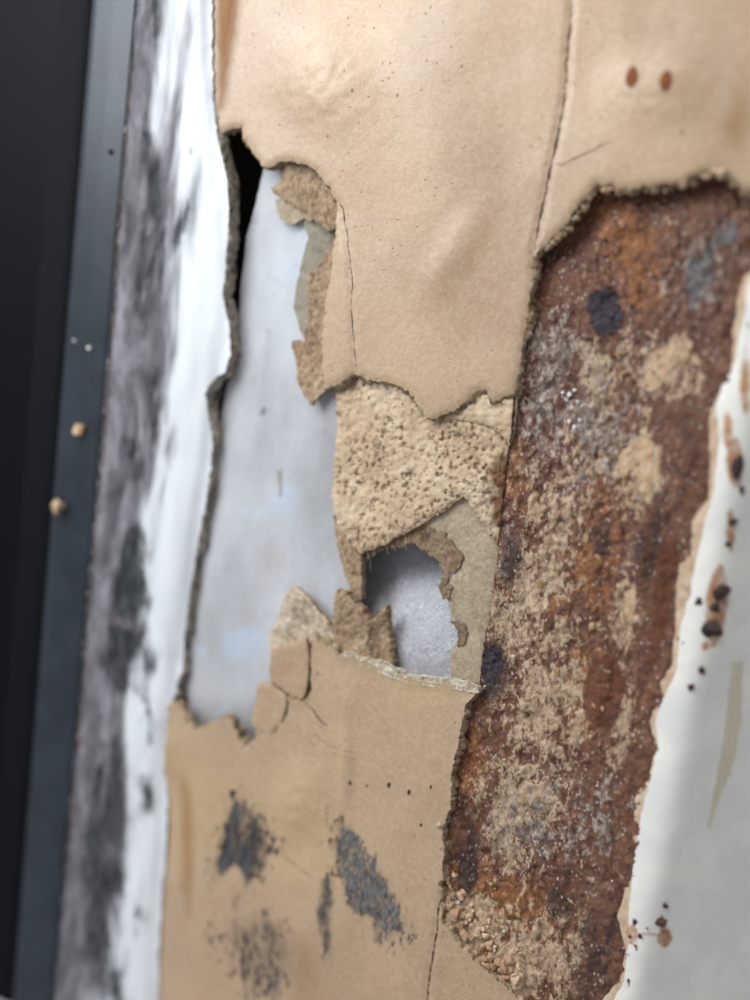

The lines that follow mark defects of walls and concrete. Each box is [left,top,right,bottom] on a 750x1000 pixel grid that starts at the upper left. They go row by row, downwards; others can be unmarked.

crack [534,2,609,249]
rust [626,66,638,87]
rust [660,71,672,91]
crack [340,205,356,366]
flaking render [251,163,519,733]
rust [436,166,750,1000]
crack [269,681,327,734]
leakage [205,785,284,890]
leakage [318,812,415,956]
leakage [205,921,290,999]